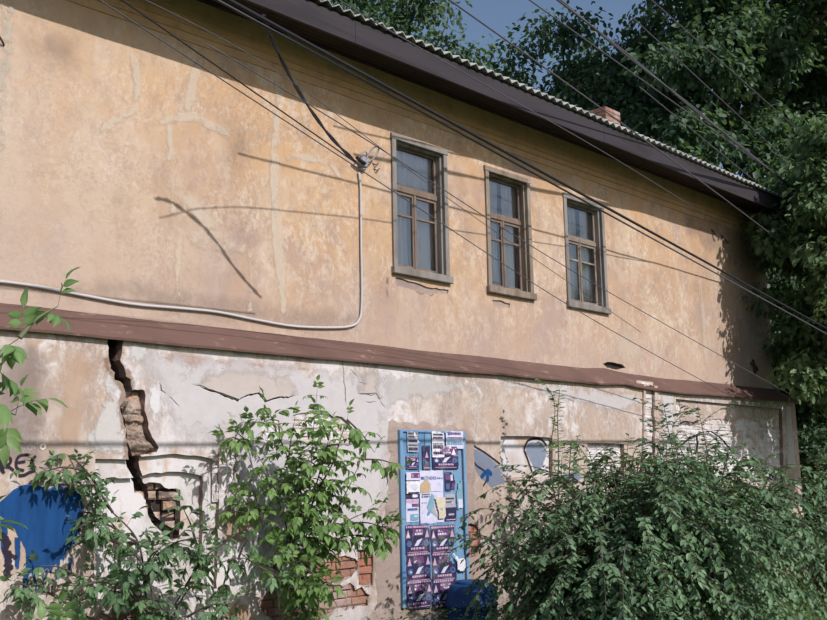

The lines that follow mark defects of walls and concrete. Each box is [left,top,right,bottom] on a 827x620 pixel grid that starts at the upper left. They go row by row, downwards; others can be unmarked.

peeling [87,358,134,460]
crack [108,339,179,539]
crack [196,385,295,402]
peeling [131,343,389,529]
peeling [507,380,653,462]
peeling [662,394,796,468]
flaking render [258,549,375,620]